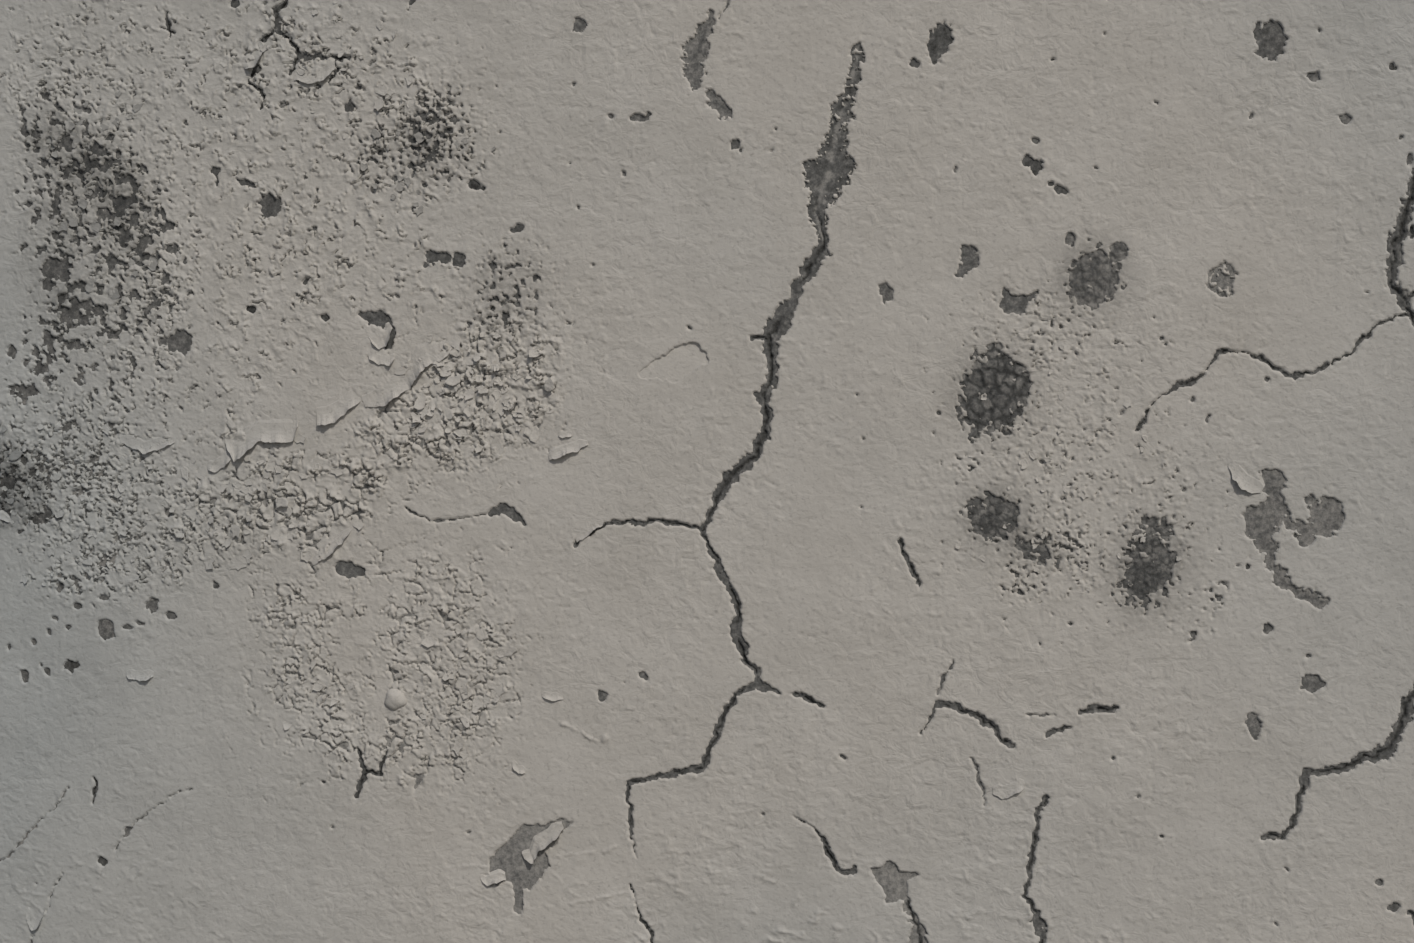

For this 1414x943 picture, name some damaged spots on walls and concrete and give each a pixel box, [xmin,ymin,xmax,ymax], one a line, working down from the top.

peeling [681,0,732,120]
crack [1135,168,1414,431]
peeling [0,0,588,789]
crack [573,42,865,943]
peeling [1228,460,1345,609]
crack [919,661,1119,806]
crack [1260,684,1414,841]
peeling [480,818,572,914]
crack [907,901,923,943]
crack [1021,795,1050,943]